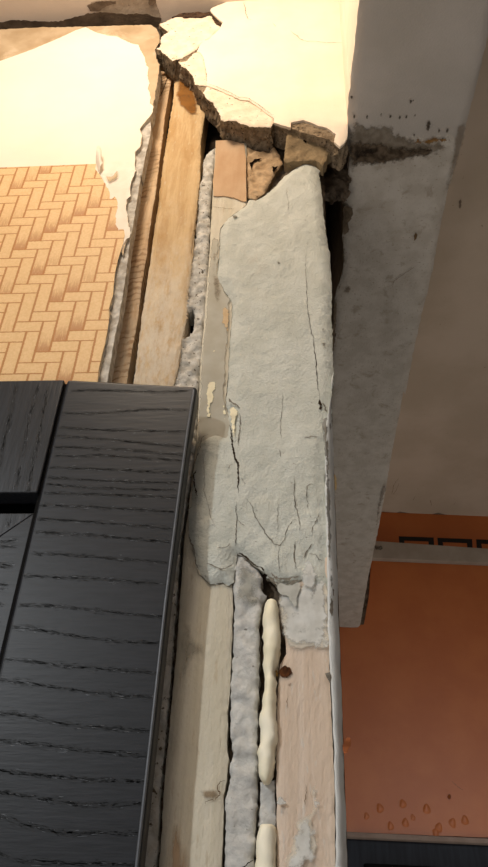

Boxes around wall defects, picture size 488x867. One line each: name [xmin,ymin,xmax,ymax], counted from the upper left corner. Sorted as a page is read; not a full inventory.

spalling [87,0,274,132]
water stain [350,115,465,176]
crack [305,263,327,412]
crack [189,399,325,585]